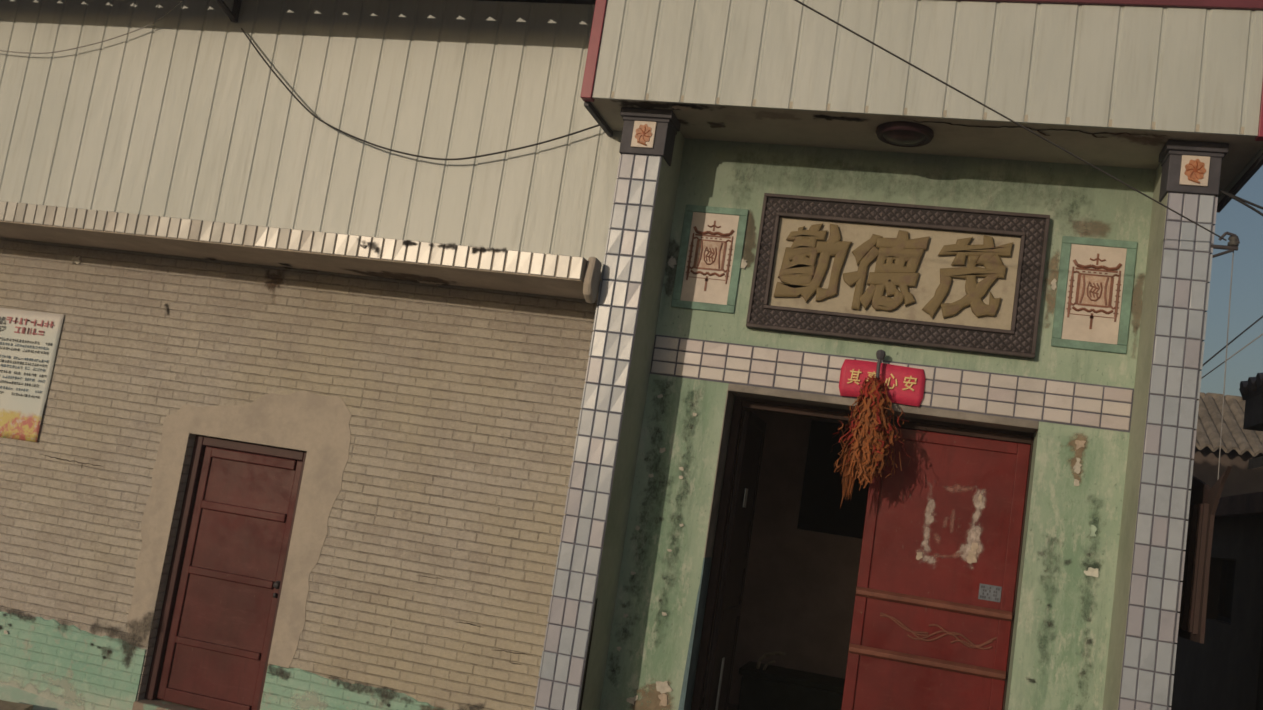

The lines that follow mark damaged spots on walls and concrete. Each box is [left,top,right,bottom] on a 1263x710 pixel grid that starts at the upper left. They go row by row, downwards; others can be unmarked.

spalling [402,240,457,249]
peeling [1068,434,1087,486]
damp [610,382,697,682]
spalling [627,681,673,710]